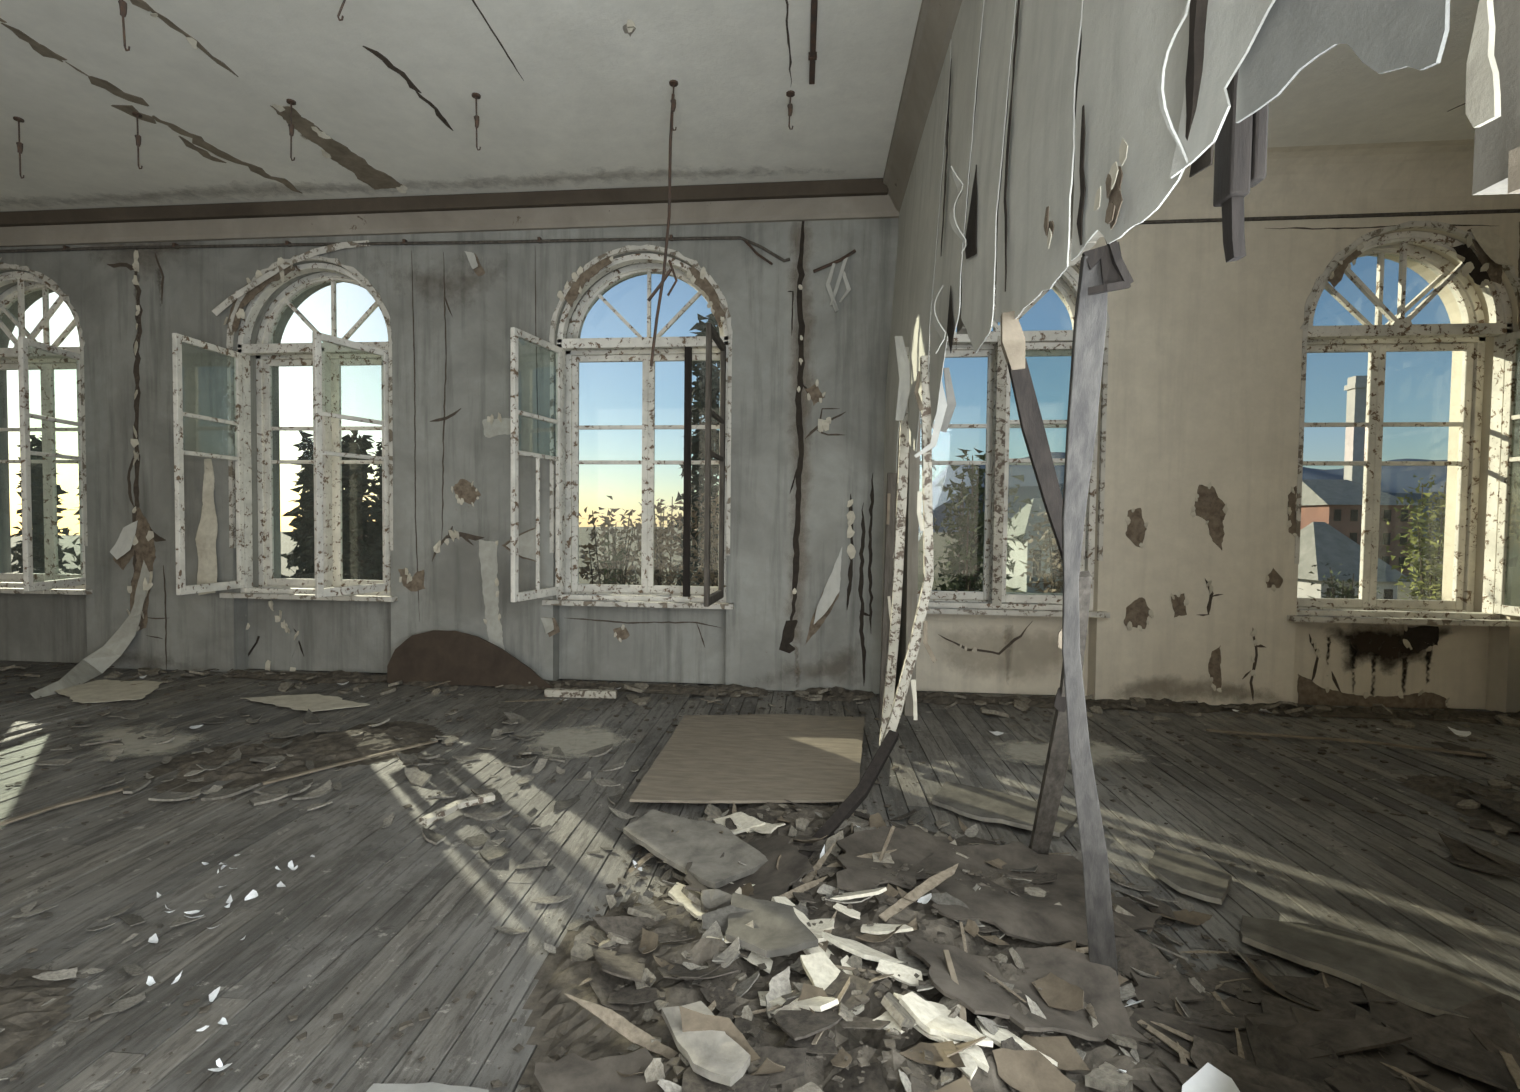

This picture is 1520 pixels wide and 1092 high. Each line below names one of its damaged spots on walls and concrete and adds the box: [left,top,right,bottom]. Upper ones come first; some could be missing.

crack [0,18,302,193]
crack [130,0,238,77]
crack [362,46,453,131]
peeling [1094,138,1128,229]
flaking render [1453,222,1520,328]
crack [107,249,167,670]
crack [779,221,845,653]
flaking render [110,508,156,631]
crack [846,474,874,684]
flaking render [1125,508,1149,548]
flaking render [1190,482,1229,550]
damp [1327,627,1448,695]